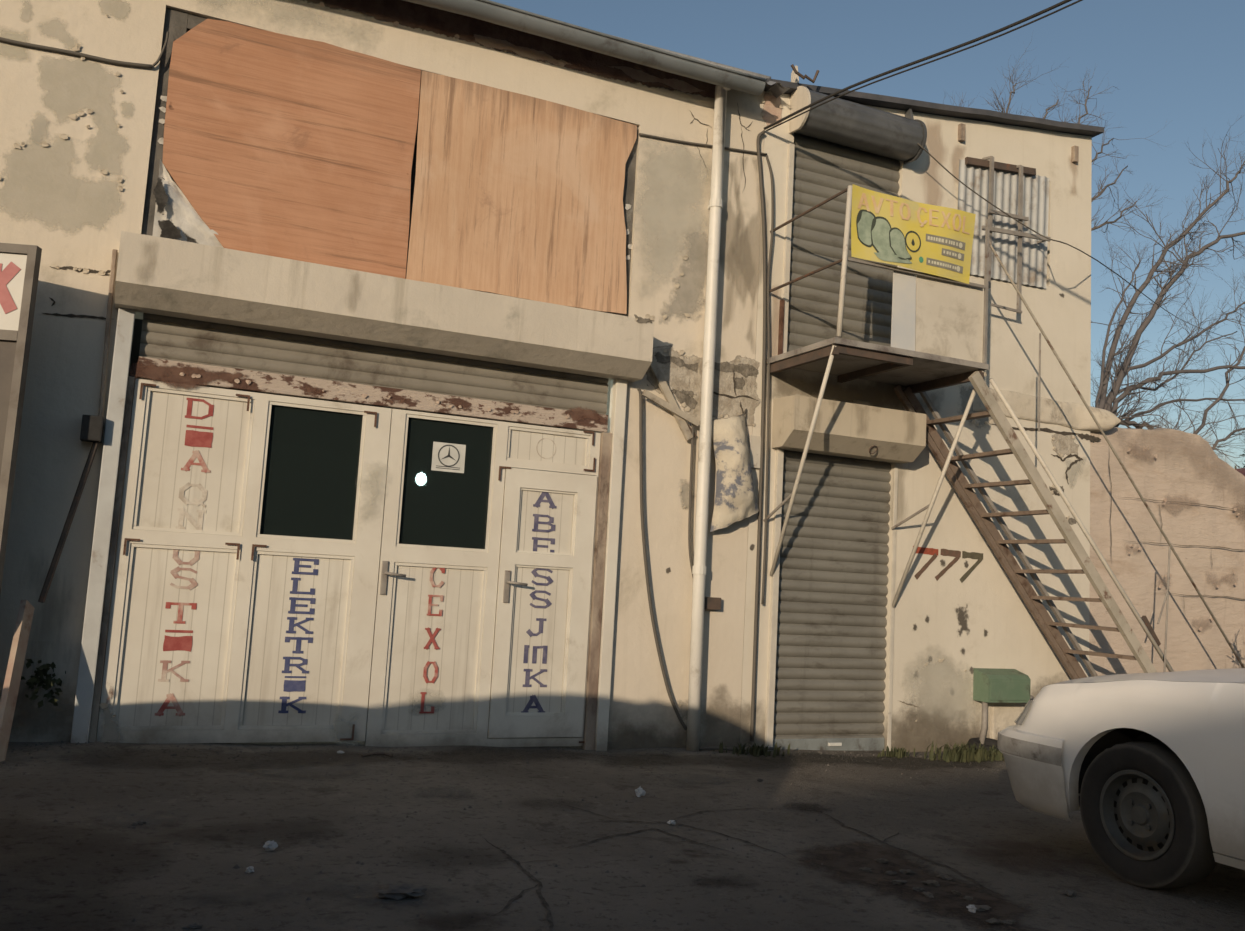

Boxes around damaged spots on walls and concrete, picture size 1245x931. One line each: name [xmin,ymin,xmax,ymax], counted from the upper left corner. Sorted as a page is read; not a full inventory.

peeling [100,0,129,18]
peeling [303,0,716,98]
peeling [0,3,132,174]
corrosion [128,362,251,389]
corrosion [564,407,607,424]
flaking render [646,345,760,426]
peeling [679,483,689,508]
flaking render [1049,434,1083,496]